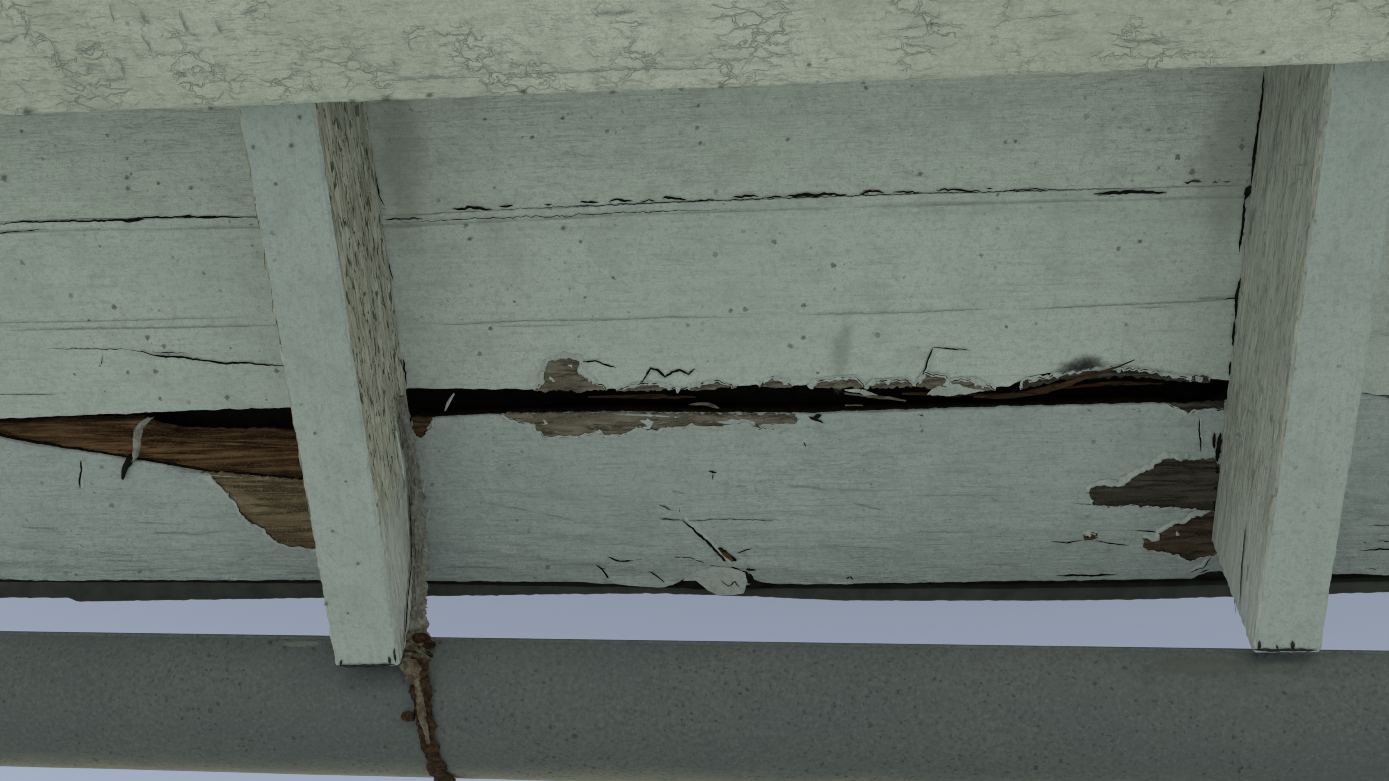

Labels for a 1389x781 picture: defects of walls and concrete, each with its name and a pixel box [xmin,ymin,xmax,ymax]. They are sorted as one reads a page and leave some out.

crack [0,215,257,234]
crack [375,73,1307,375]
peeling [532,351,737,393]
crack [640,367,697,383]
peeling [121,417,154,480]
peeling [502,410,801,440]
crack [1198,408,1252,511]
peeling [170,468,316,554]
crack [403,480,412,649]
crack [594,471,781,589]
crack [1051,530,1154,577]
peeling [1083,451,1220,564]